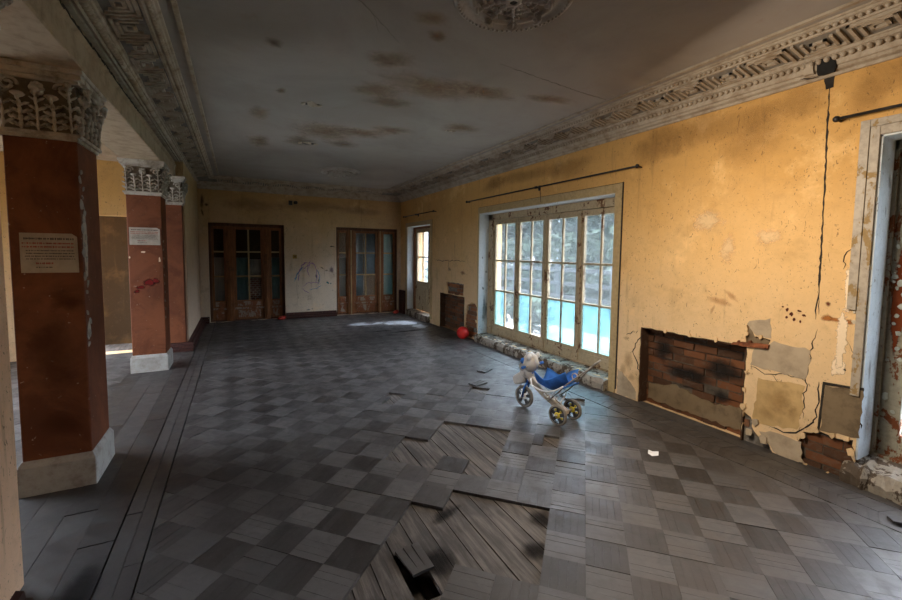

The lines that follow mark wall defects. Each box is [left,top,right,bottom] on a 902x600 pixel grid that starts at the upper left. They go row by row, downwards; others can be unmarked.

peeling [885,237,902,362]
flaking render [637,327,771,450]
flaking render [799,427,860,476]